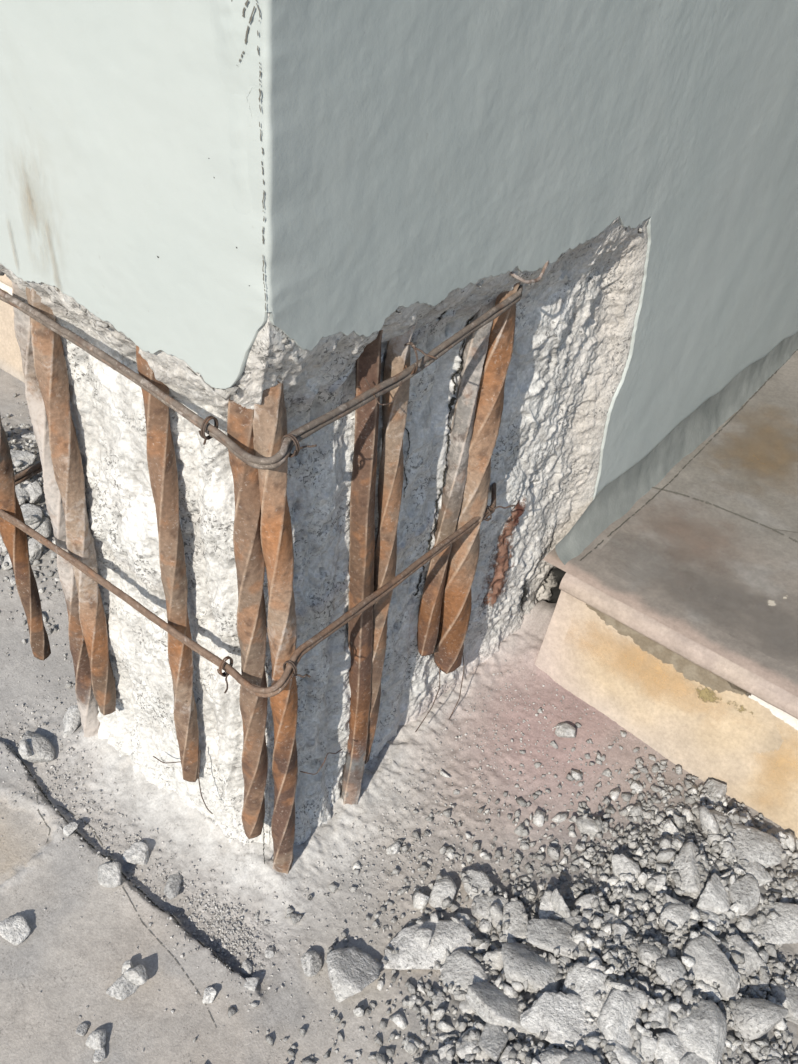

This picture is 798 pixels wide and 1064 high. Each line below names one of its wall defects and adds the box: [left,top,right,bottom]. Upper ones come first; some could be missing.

crack [231,0,266,311]
spalling [0,216,649,846]
rust [477,499,525,607]
crack [520,349,798,616]
crack [16,754,245,1028]